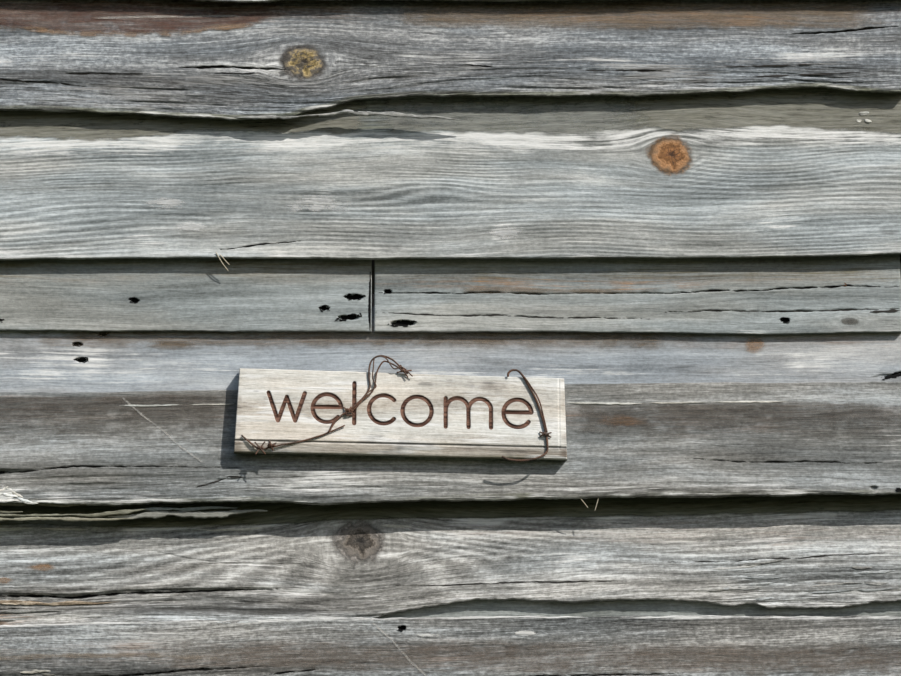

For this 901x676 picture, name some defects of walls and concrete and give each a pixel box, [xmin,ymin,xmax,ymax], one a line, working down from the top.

crack [379,292,643,319]
crack [569,284,900,313]
crack [105,665,316,676]
crack [535,668,681,676]